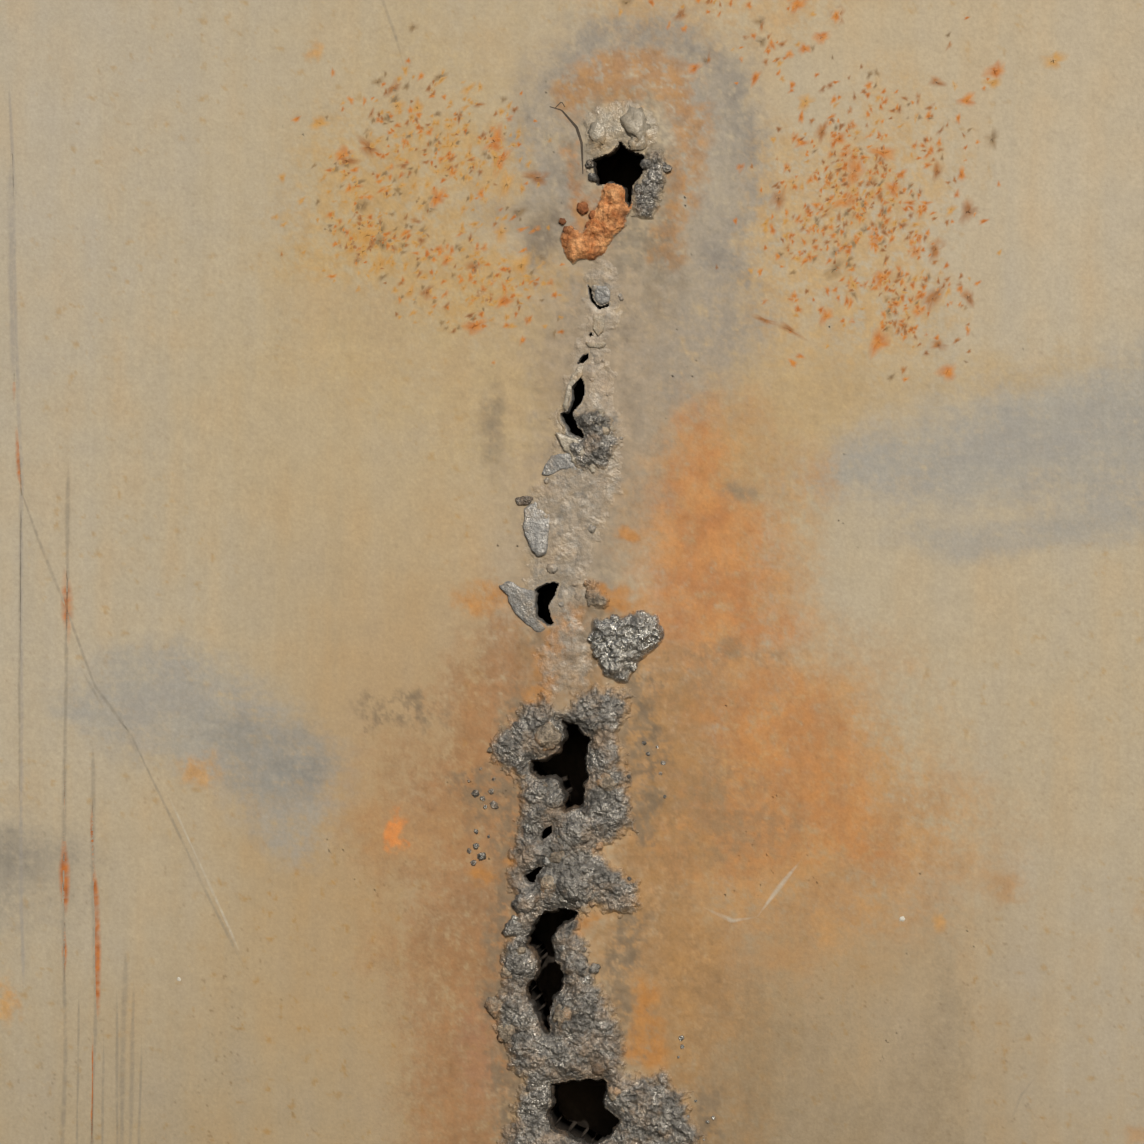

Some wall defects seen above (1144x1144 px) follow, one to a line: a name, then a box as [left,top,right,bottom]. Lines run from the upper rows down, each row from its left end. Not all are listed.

rust [249,56,596,348]
damp [0,516,117,896]
rust [60,565,75,647]
rust [542,0,1059,1010]
rust [58,833,71,979]
rust [89,803,102,1020]
rust [623,969,677,1075]